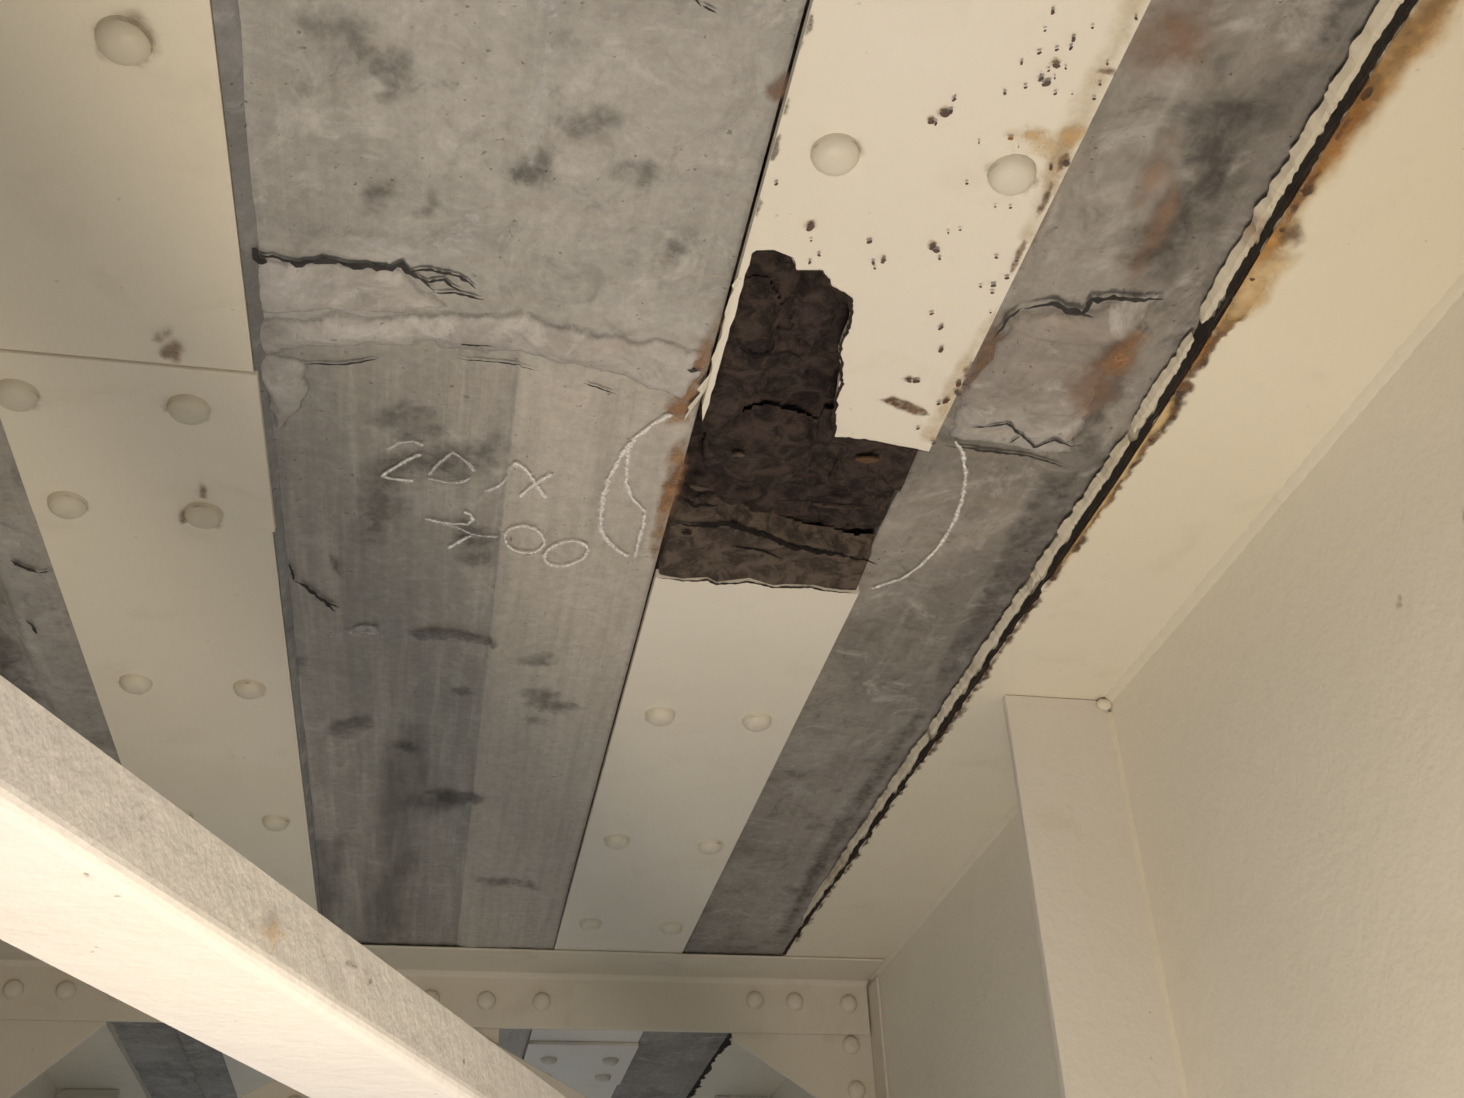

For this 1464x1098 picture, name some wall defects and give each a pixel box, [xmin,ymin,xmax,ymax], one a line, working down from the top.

rust [927,98,956,126]
rust [1020,27,1094,95]
rust [1315,0,1448,171]
water stain [1147,103,1257,259]
crack [304,357,377,365]
crack [252,248,484,300]
crack [438,339,533,370]
spalling [674,195,895,532]
rust [883,331,1002,444]
crack [994,294,1164,339]
rust [1195,201,1299,362]
rust [1063,398,1172,560]